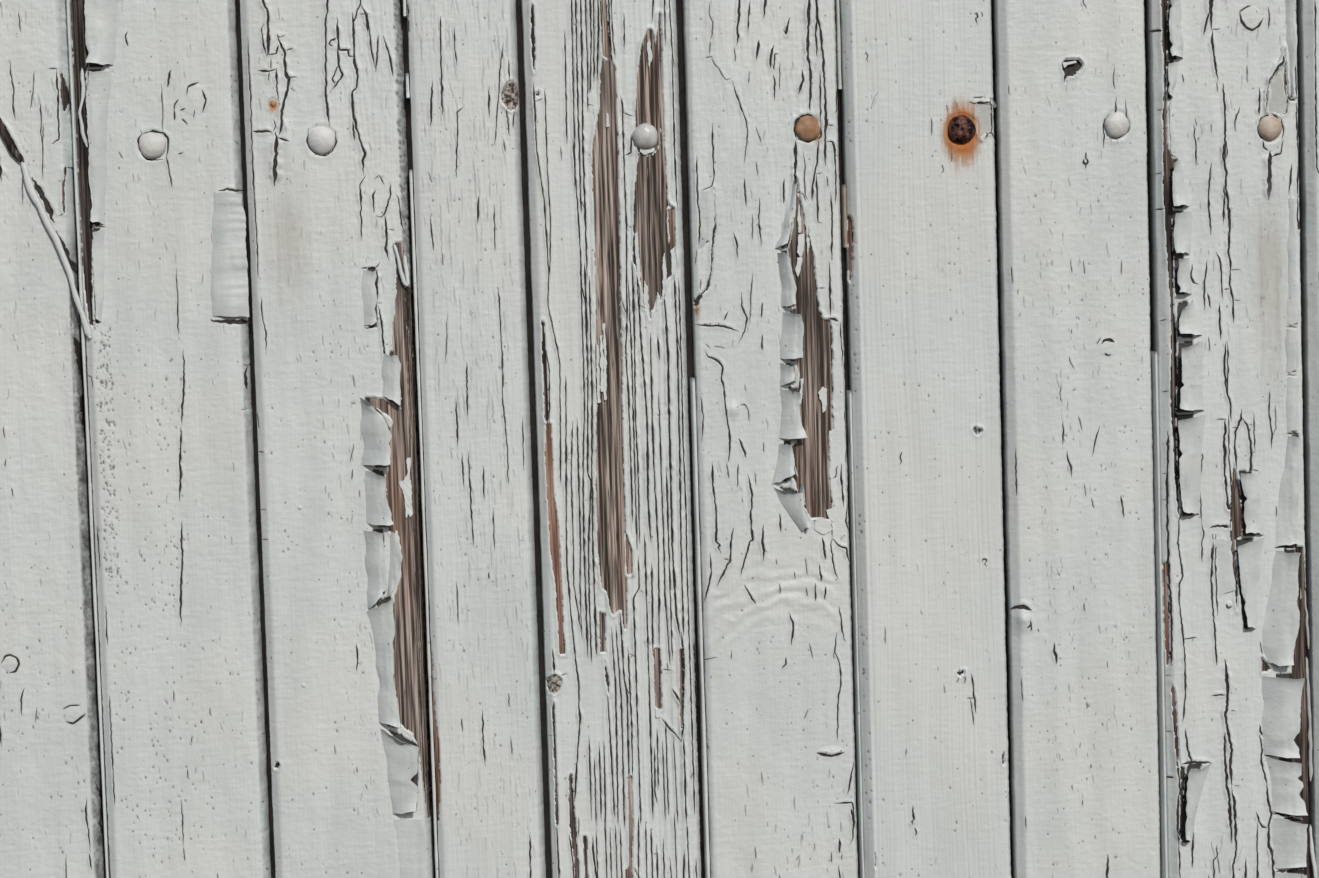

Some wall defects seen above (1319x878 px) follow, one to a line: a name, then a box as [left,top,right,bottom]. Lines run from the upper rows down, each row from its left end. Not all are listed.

peeling [59,0,118,326]
crack [176,268,185,626]
crack [211,0,443,453]
peeling [360,242,441,878]
peeling [588,0,677,692]
crack [429,0,855,878]
peeling [771,177,841,534]
rust [943,102,980,163]
crack [1103,67,1130,148]
peeling [1161,0,1206,514]
crack [1150,0,1319,878]
peeling [1210,198,1310,878]